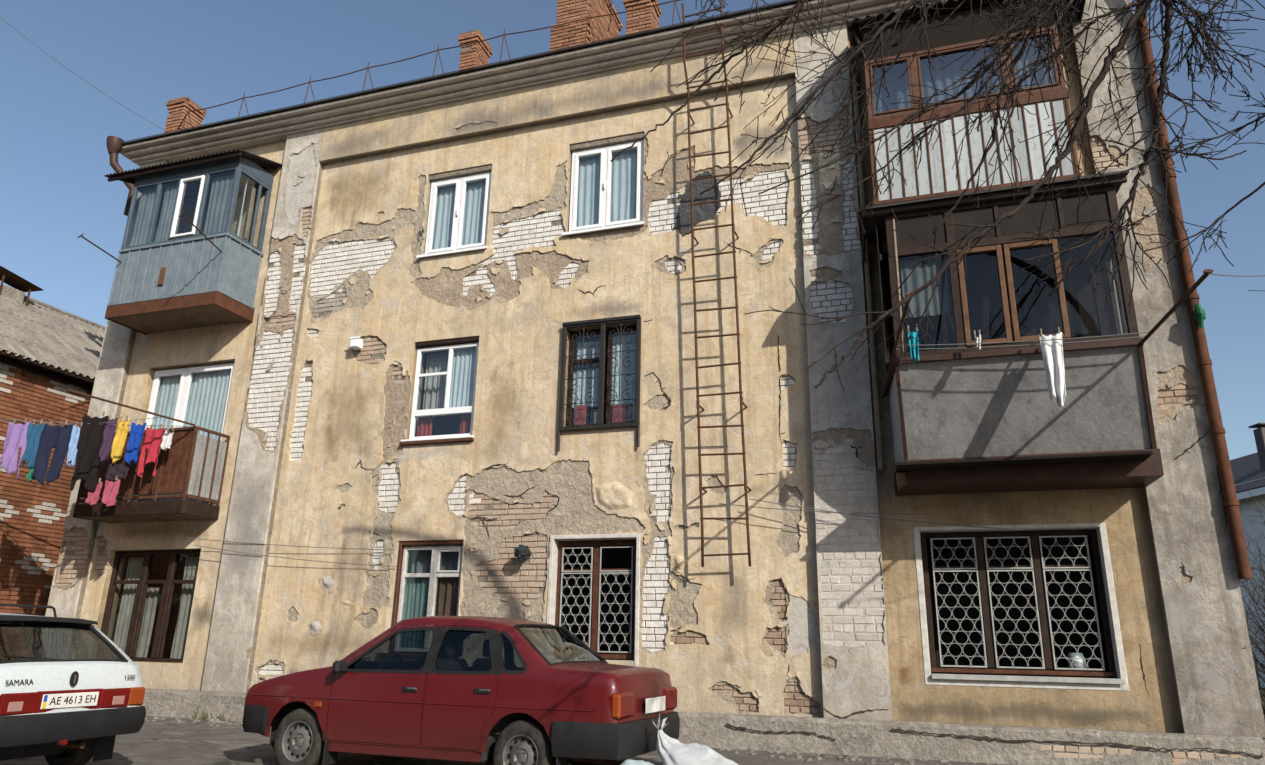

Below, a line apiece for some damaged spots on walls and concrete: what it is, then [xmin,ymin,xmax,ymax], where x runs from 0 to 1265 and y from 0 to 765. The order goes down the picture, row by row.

peeling [245,73,861,462]
peeling [336,481,353,513]
peeling [353,335,411,632]
peeling [442,440,709,657]
spalling [705,423,885,716]